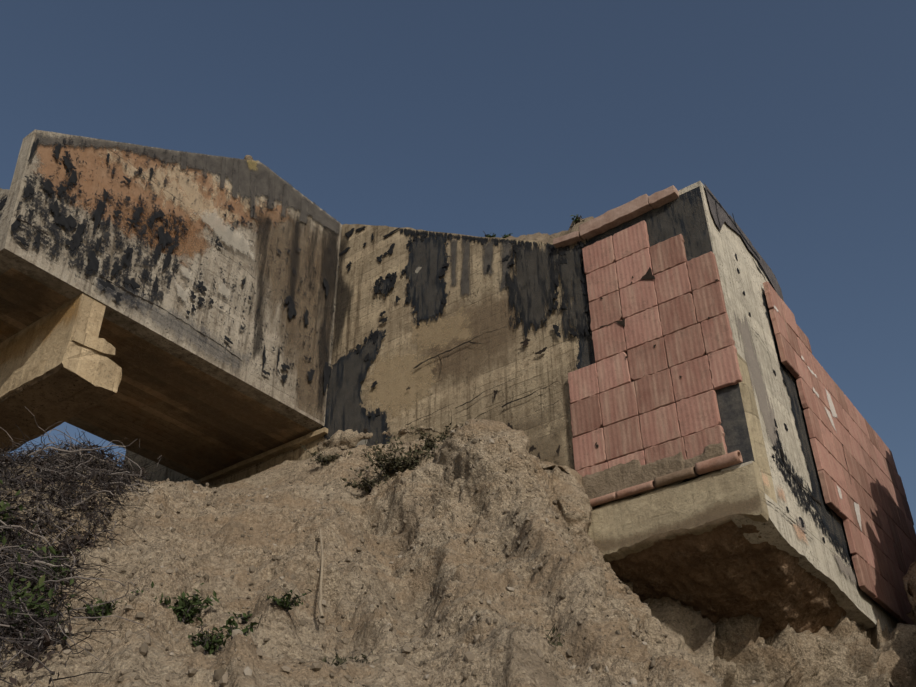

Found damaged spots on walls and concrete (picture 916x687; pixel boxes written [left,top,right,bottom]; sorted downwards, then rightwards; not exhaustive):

rust [36,143,293,265]
damp [35,133,555,417]
crack [413,327,503,377]
spalling [593,353,809,550]